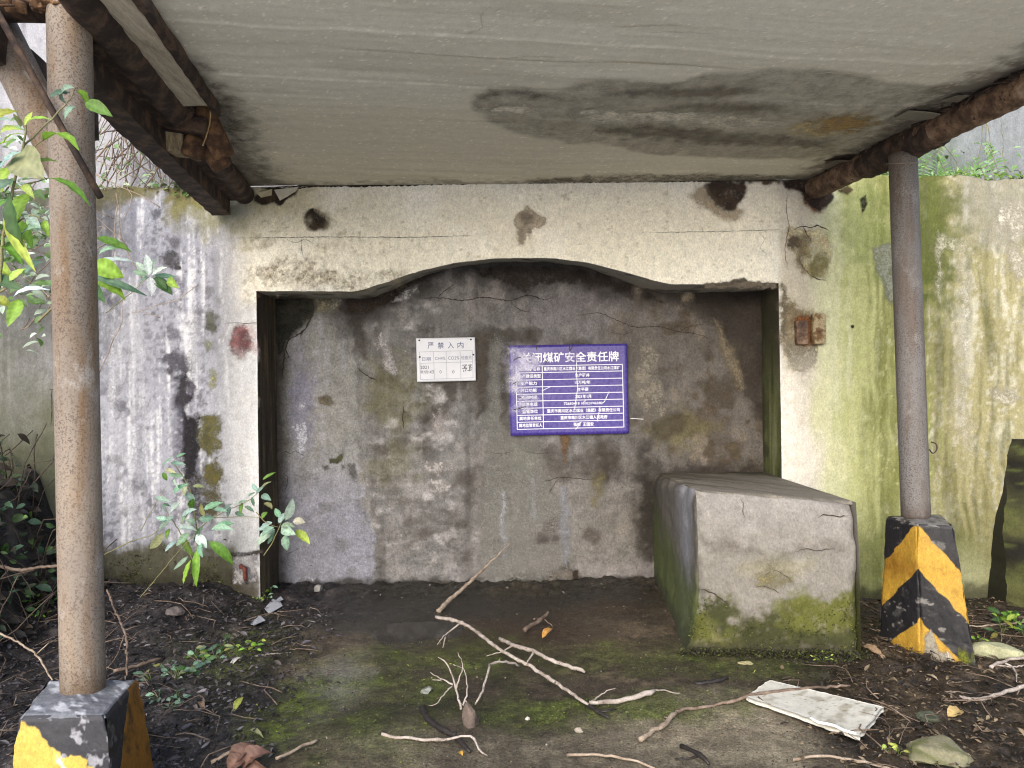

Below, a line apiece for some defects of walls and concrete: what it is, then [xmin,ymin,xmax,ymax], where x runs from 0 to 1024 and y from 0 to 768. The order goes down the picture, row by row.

damp [571,87,819,154]
spalling [304,208,330,231]
crack [262,183,477,191]
spalling [694,181,746,220]
crack [656,179,829,281]
crack [413,286,561,313]
rust [230,325,256,357]
rust [779,284,817,371]
damp [162,327,225,528]